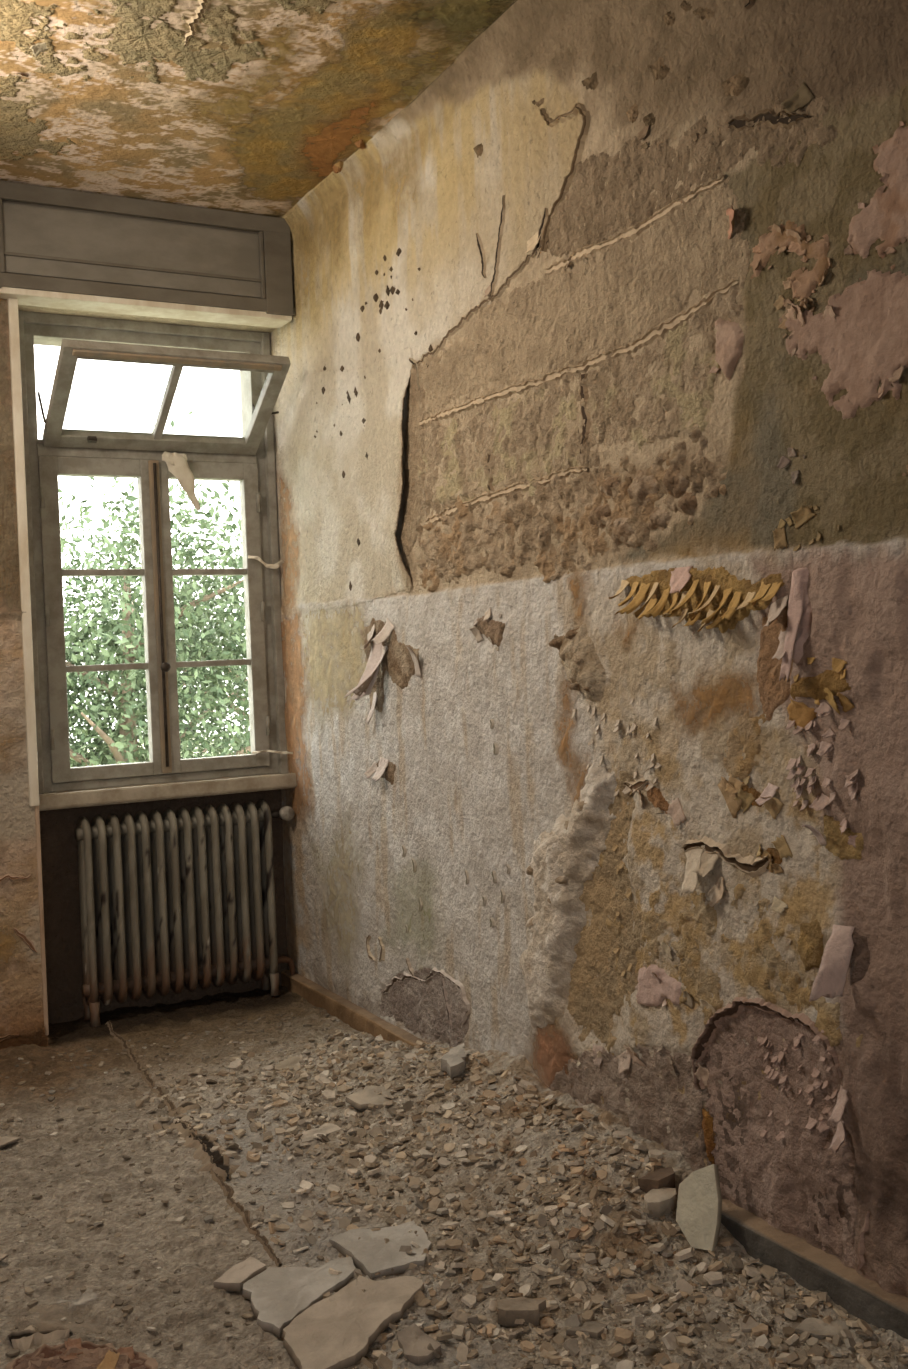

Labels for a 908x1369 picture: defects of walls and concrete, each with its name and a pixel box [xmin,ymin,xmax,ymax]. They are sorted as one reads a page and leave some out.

peeling [0,0,279,166]
crack [184,0,211,46]
peeling [274,0,337,26]
leakage [192,0,516,214]
crack [744,0,755,9]
flaking render [296,72,908,725]
peeling [364,757,396,785]
peeling [609,566,864,860]
crack [0,874,38,953]
flaking render [379,958,471,1047]
flaking render [550,704,870,1269]
crack [105,1020,282,1267]